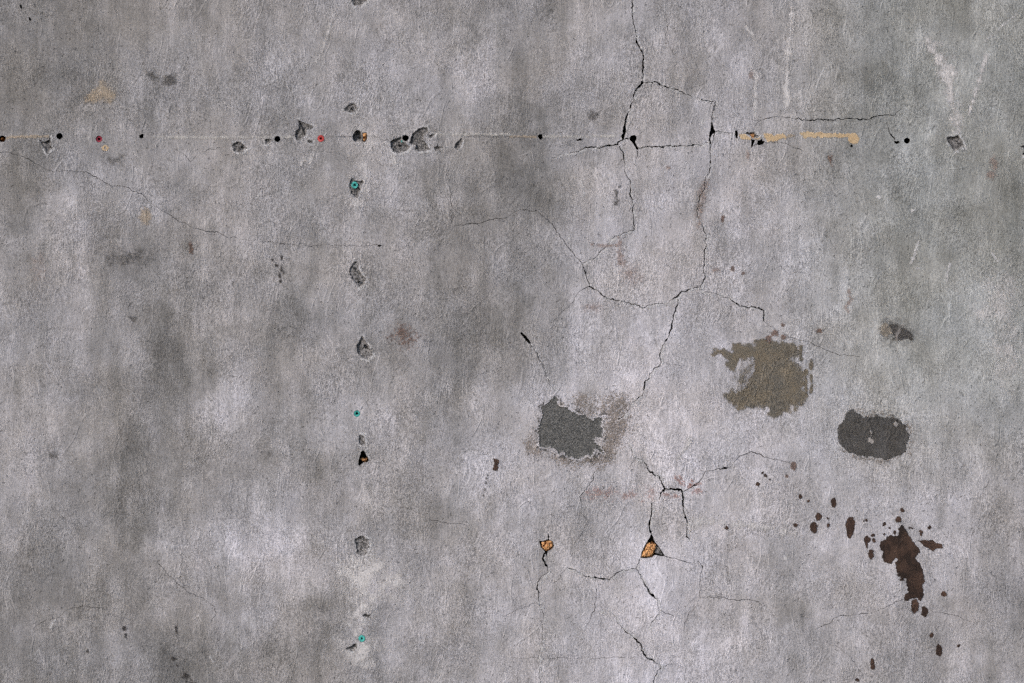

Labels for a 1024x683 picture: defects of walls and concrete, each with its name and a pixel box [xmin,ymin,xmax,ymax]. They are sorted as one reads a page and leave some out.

spalling [295,117,316,145]
spalling [388,125,463,155]
crack [440,0,901,420]
spalling [349,261,367,290]
spalling [356,336,376,362]
water stain [711,339,814,418]
peeling [521,391,638,471]
spalling [353,535,372,559]
crack [502,445,789,683]
crack [821,599,903,681]